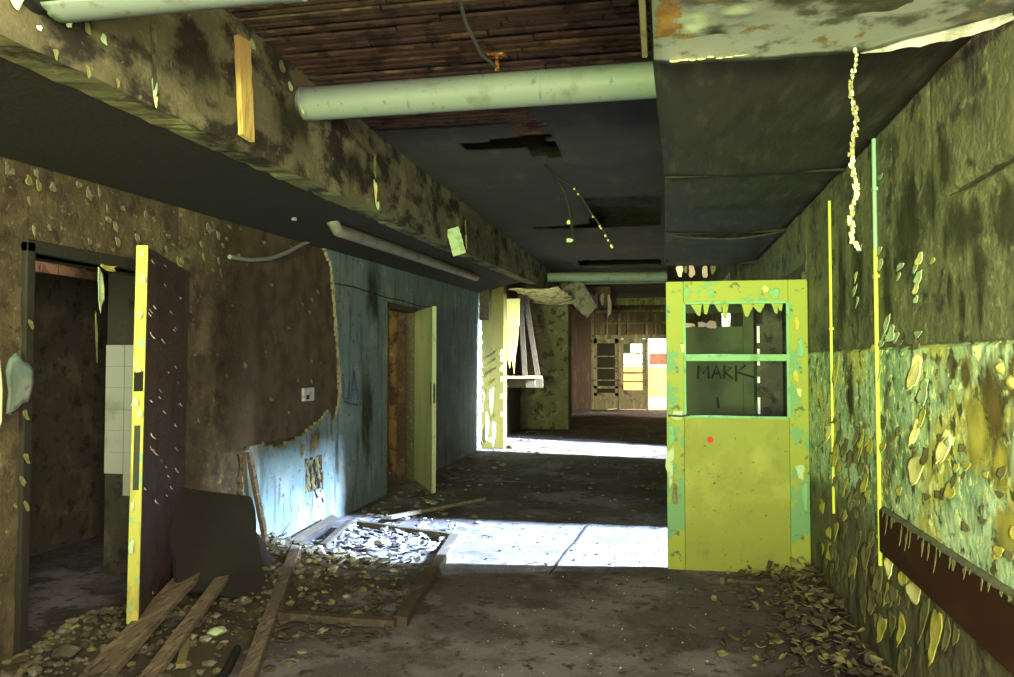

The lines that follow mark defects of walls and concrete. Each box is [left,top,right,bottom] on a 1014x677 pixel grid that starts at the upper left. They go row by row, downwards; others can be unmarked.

corrosion [655,0,694,39]
damp [674,13,723,38]
damp [718,5,753,17]
damp [839,0,914,15]
peeling [763,285,780,299]
peeling [895,252,935,303]
peeling [856,314,971,501]
flaking render [190,220,503,647]
peeling [982,466,1007,499]
peeling [961,516,988,532]
peeling [992,525,1014,562]